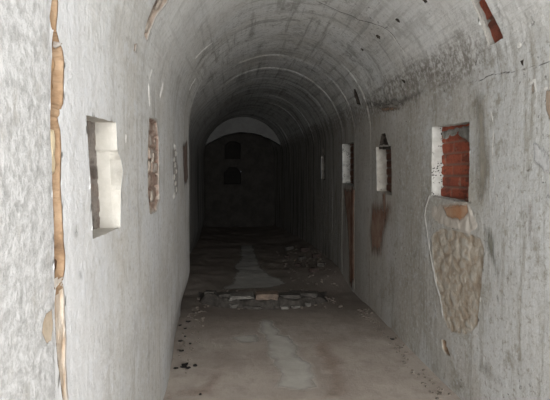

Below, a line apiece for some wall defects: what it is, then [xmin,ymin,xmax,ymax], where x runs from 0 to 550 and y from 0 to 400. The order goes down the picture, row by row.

spalling [144,0,169,41]
spalling [471,0,503,46]
flaking render [148,117,160,214]
corrosion [370,193,389,253]
flaking render [431,228,484,335]
flaking render [42,310,53,343]